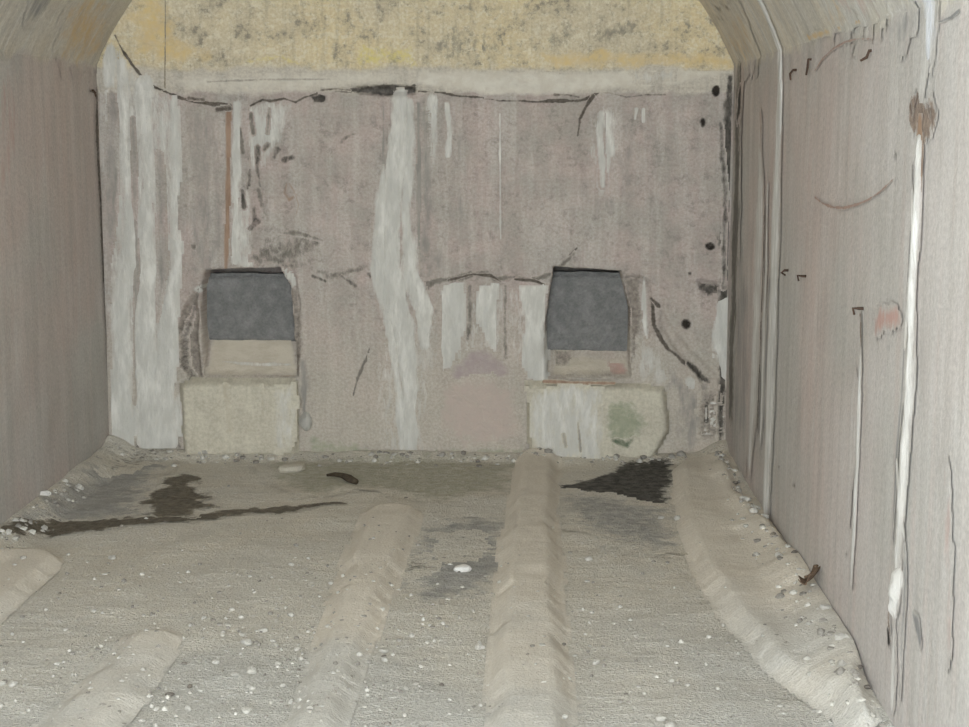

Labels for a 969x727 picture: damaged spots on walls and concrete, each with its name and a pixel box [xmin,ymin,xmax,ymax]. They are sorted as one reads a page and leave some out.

water stain [4,0,783,557]
crack [649,297,711,385]
water stain [845,134,923,716]
corrosion [907,88,938,192]